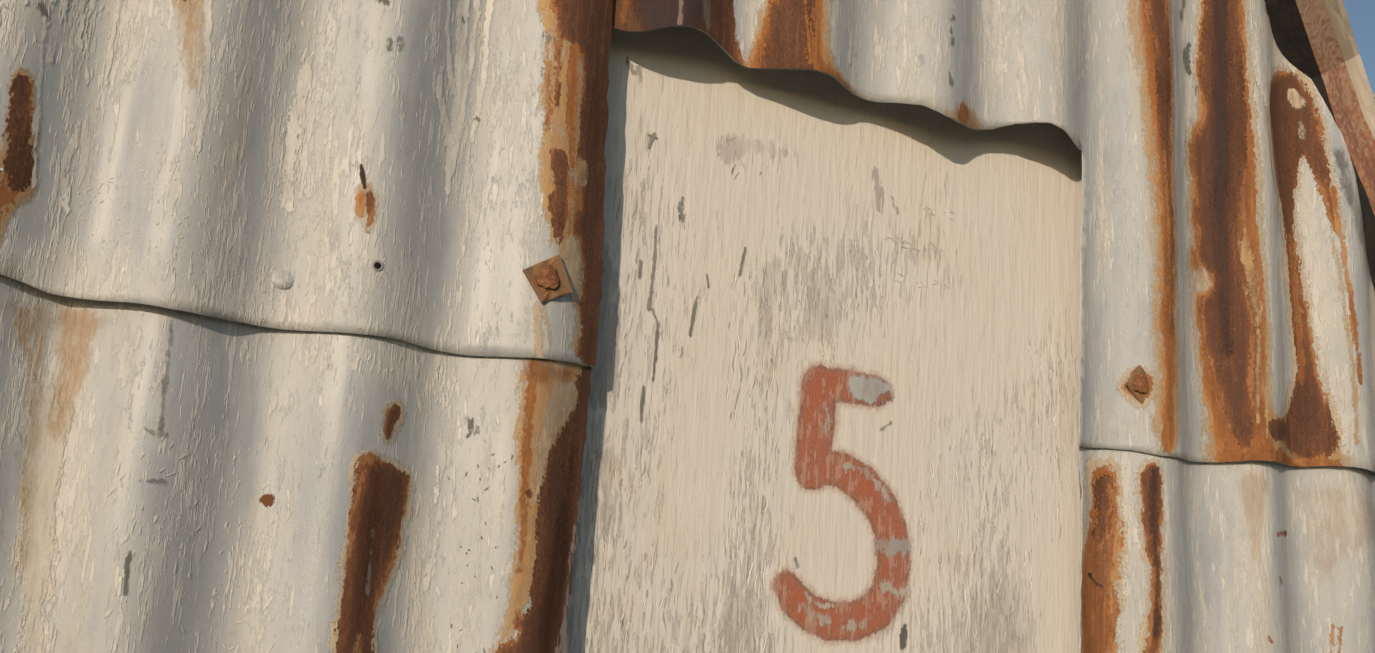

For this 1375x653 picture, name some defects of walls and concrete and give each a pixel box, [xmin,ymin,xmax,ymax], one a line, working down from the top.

rust [0,68,39,243]
rust [355,164,376,232]
rust [489,0,862,653]
peeling [726,237,881,458]
rust [1081,0,1363,653]
rust [328,399,416,653]
peeling [586,534,711,653]
peeling [724,469,772,653]
peeling [798,591,856,632]
peeling [842,461,894,503]
peeling [919,386,1065,653]